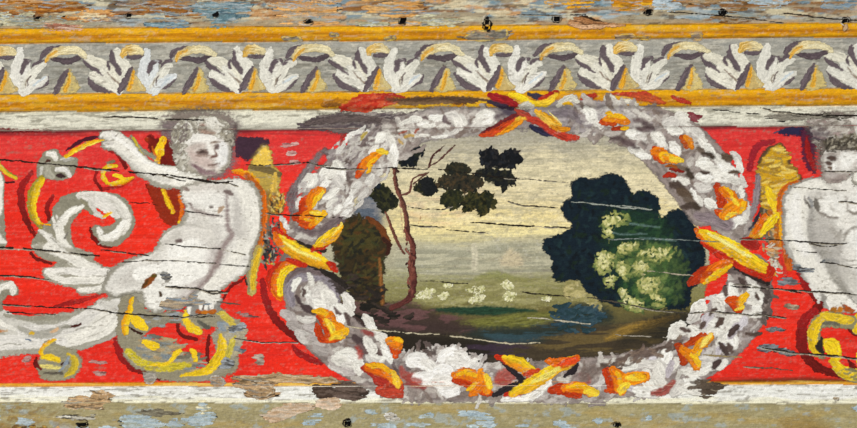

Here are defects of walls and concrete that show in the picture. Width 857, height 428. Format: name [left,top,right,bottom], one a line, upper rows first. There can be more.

peeling [544,0,600,9]
peeling [611,0,792,24]
crack [0,159,238,187]
crack [246,161,652,234]
crack [790,171,857,204]
peeling [228,311,258,333]
peeling [209,349,344,425]
peeling [15,417,35,426]
peeling [55,390,217,428]
peeling [365,409,434,428]
peeling [457,410,497,428]
peeling [553,419,577,428]